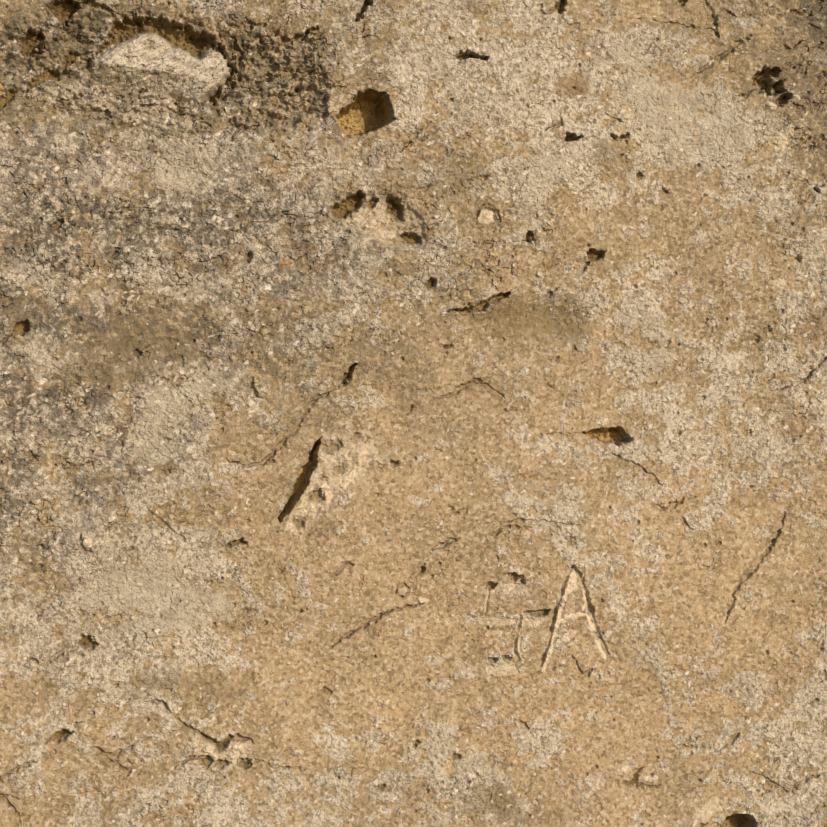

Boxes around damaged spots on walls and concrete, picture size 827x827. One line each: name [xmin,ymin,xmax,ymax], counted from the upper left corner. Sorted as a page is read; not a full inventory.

spalling [0,0,345,146]
crack [248,375,264,400]
crack [432,376,506,400]
crack [223,385,342,469]
crack [725,511,787,624]
crack [326,602,425,651]
spalling [692,795,724,827]